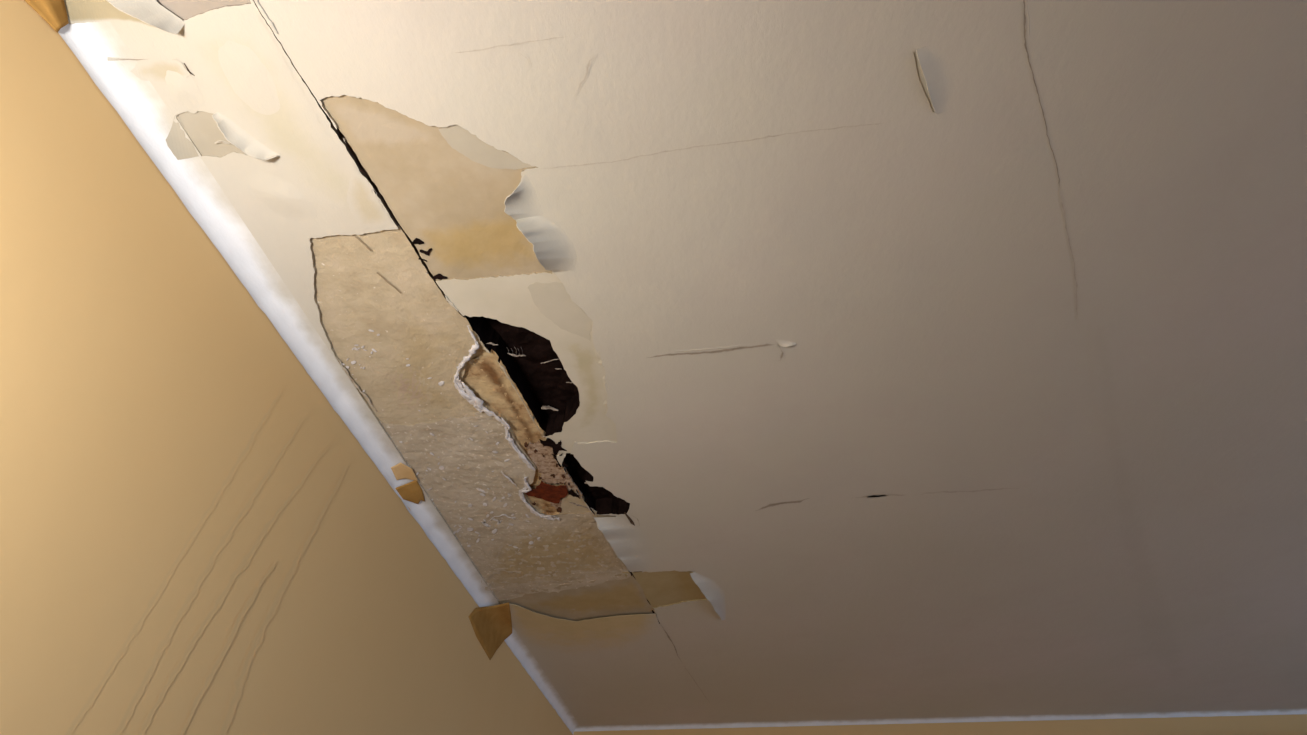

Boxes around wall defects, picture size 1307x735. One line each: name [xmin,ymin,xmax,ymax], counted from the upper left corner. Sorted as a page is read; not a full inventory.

peeling [106,0,251,35]
peeling [166,111,280,161]
damp [64,0,550,278]
crack [253,0,465,318]
crack [1022,0,1078,319]
peeling [310,95,726,662]
corrosion [525,481,568,504]
crack [644,338,797,362]